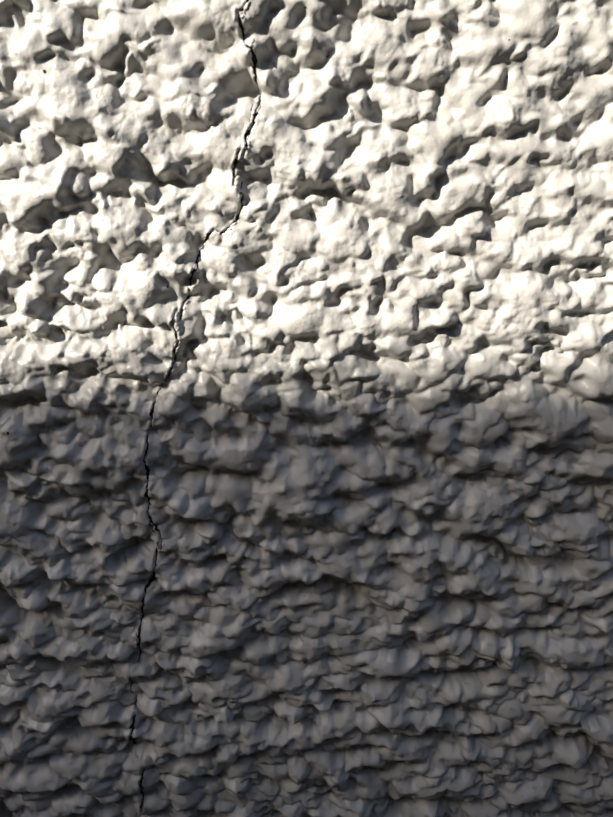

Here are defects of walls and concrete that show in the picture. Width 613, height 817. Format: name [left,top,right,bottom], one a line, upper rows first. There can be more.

crack [128,0,261,817]